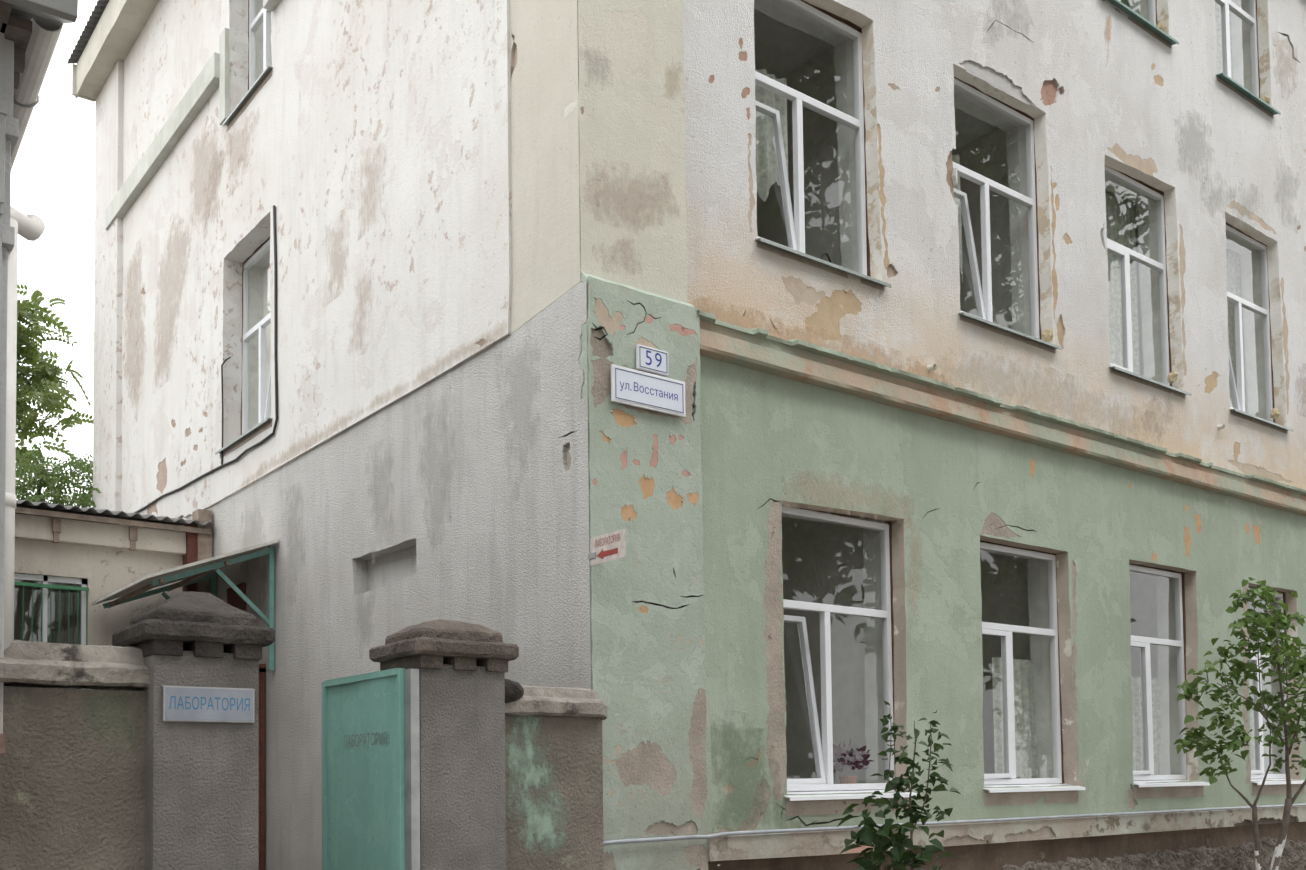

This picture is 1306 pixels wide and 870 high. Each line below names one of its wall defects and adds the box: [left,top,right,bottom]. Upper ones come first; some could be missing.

spalling [960,61,1062,106]
peeling [1107,143,1157,176]
peeling [782,276,862,340]
peeling [586,297,699,521]
peeling [981,512,1020,538]
crack [632,570,703,609]
peeling [646,500,787,870]
peeling [613,740,676,796]